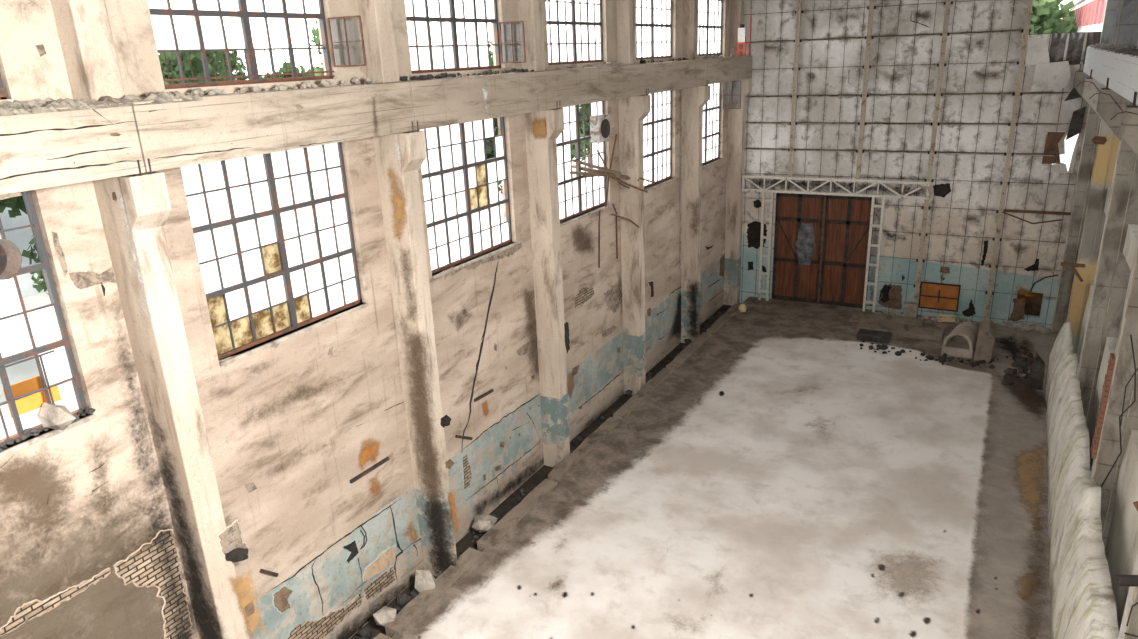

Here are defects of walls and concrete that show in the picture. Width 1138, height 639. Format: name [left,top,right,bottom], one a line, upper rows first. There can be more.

corrosion [389,170,407,236]
water stain [525,291,539,374]
water stain [407,335,443,505]
water stain [0,460,66,526]
flaking render [0,528,195,639]
water stain [150,509,192,639]
spalling [217,520,250,565]
spalling [245,601,255,617]
peeling [272,585,293,614]
flaking render [285,544,396,639]
spalling [342,539,359,564]